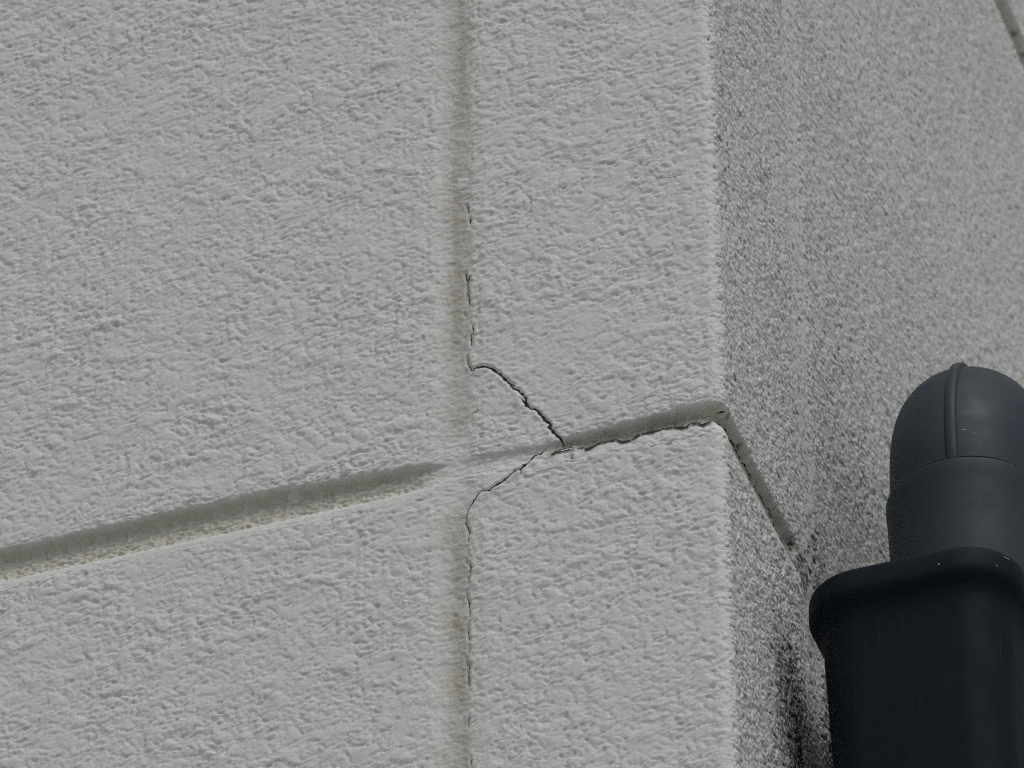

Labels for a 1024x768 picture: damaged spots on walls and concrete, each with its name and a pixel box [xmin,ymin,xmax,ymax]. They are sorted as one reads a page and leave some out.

crack [464,273,774,685]